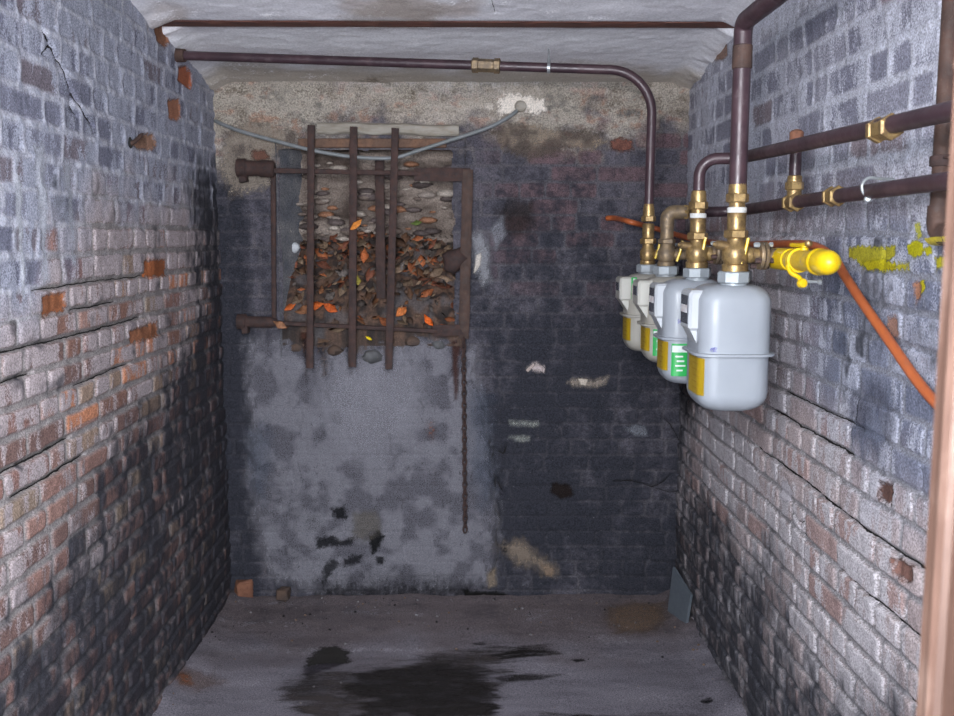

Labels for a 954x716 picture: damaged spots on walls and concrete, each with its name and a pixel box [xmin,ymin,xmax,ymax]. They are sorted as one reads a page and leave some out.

crack [41,32,90,124]
crack [0,275,141,354]
crack [73,364,125,386]
crack [0,438,80,498]
spalling [877,480,894,506]
water stain [495,541,554,576]
spalling [889,557,914,583]
water stain [280,645,560,716]